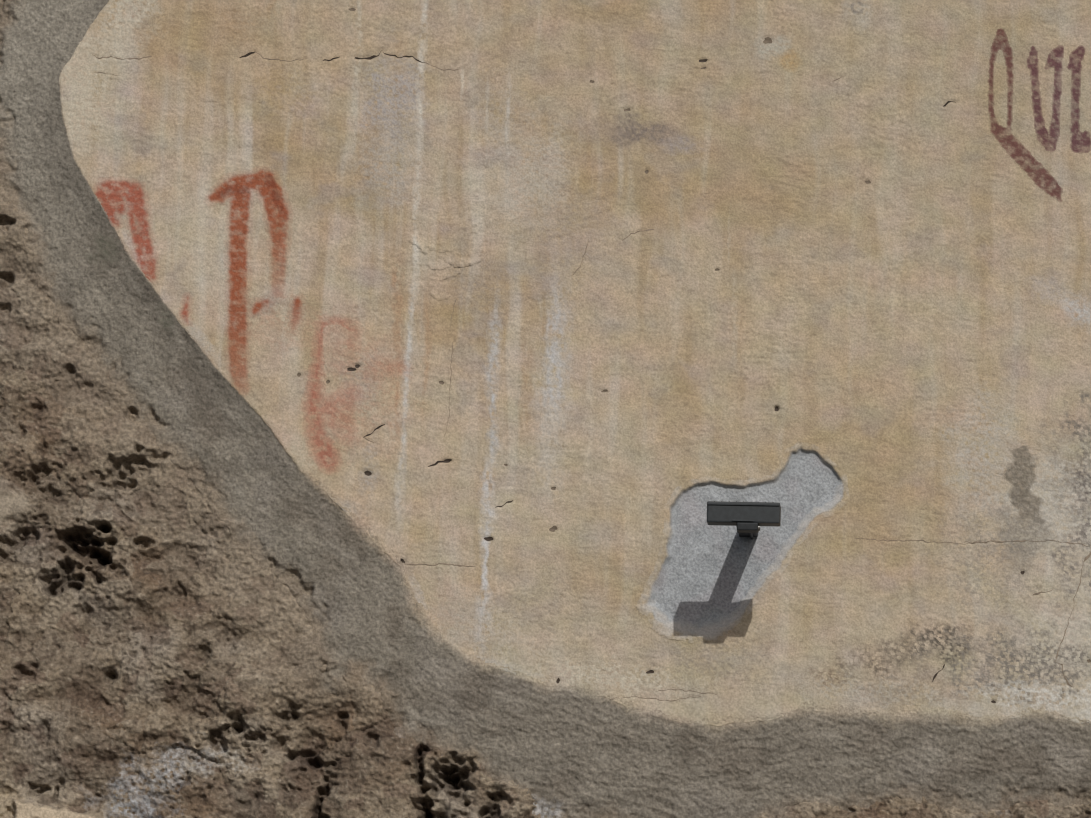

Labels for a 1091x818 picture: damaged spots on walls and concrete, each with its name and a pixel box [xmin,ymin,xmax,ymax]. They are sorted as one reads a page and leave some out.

crack [94,55,151,75]
crack [239,52,458,70]
spalling [636,441,850,643]
damp [776,374,1091,724]
crack [855,538,1091,687]